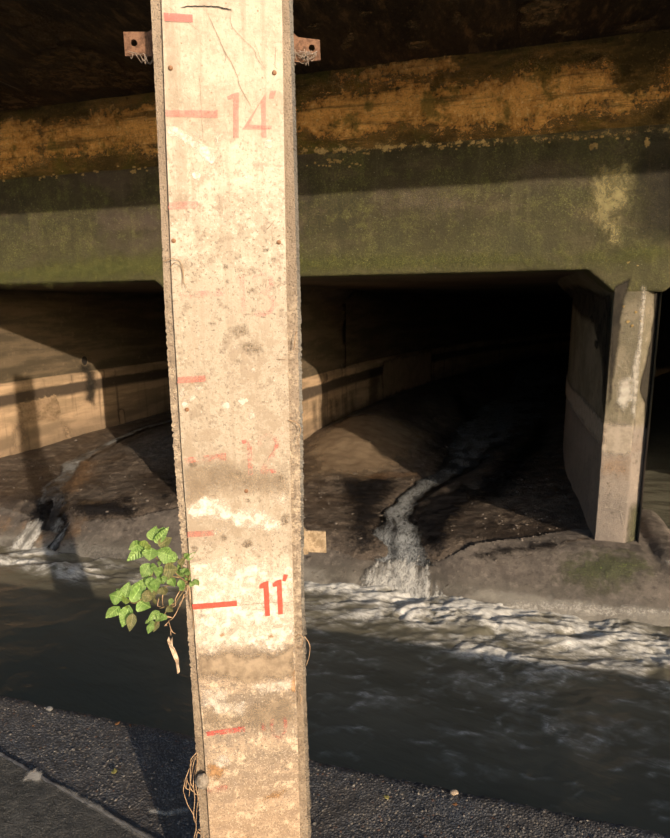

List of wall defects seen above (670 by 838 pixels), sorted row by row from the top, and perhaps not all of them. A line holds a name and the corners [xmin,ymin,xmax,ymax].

crack [163,2,251,106]
damp [592,160,633,243]
damp [82,365,95,402]
damp [565,280,660,455]